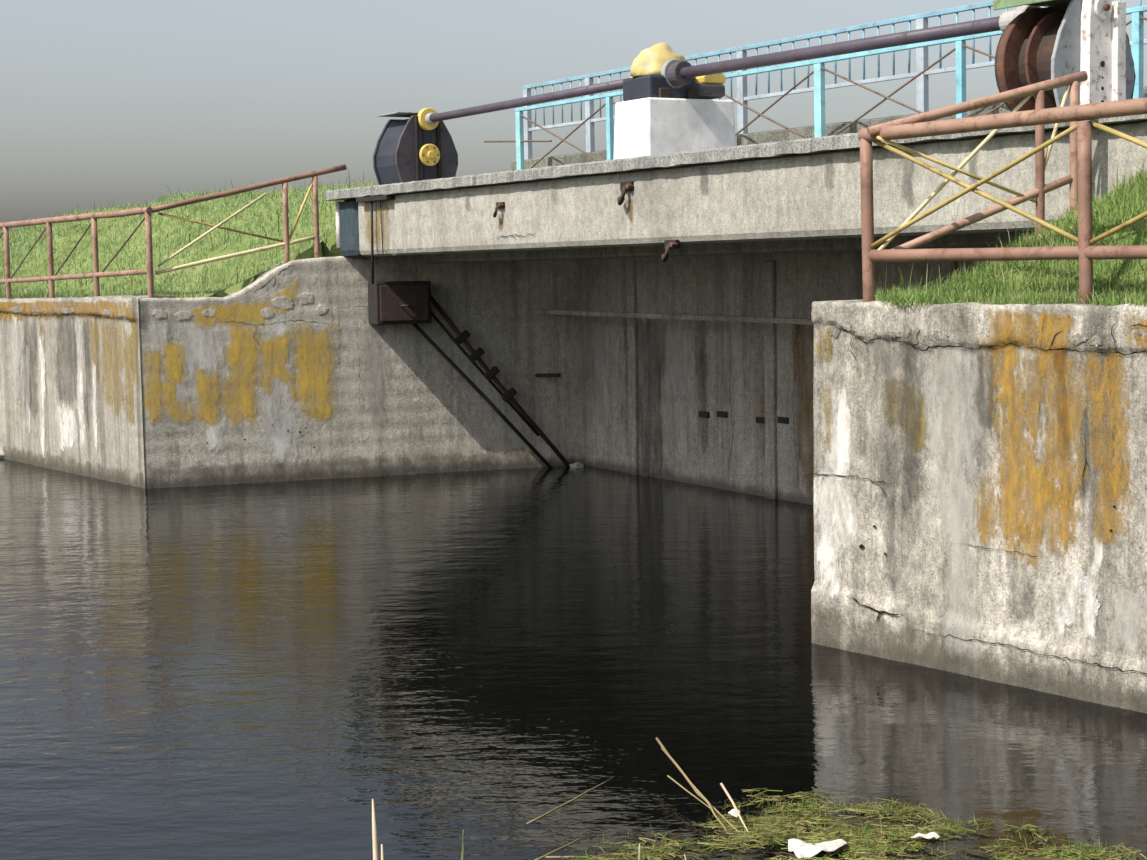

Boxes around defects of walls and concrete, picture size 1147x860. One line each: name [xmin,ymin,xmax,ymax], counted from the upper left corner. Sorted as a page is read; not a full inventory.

crack [824,318,1147,361]
leakage [0,302,102,475]
leakage [1055,351,1129,638]
crack [852,597,1147,676]
leakage [1111,589,1146,654]